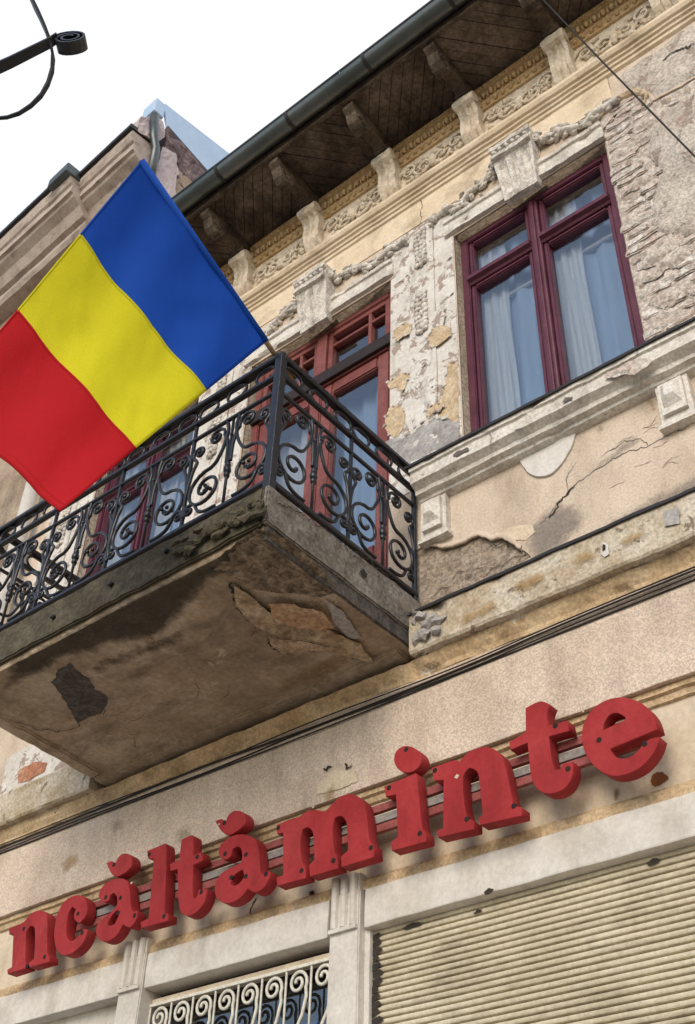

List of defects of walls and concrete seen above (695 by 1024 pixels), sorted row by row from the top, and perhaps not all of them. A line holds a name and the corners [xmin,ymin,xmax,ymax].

spalling [593,23,695,341]
peeling [426,325,451,347]
peeling [420,360,459,423]
crack [538,419,687,525]
flaking render [170,489,374,664]
spalling [417,524,535,606]
spalling [51,663,108,723]
peeling [0,745,68,795]
rust [651,772,669,787]